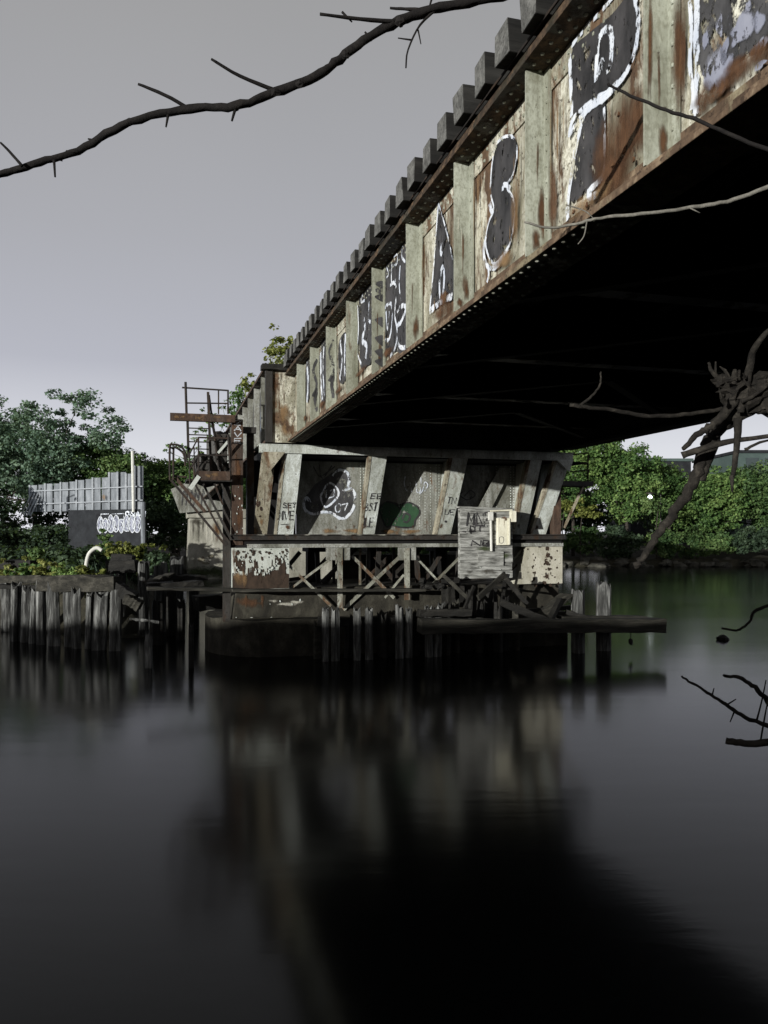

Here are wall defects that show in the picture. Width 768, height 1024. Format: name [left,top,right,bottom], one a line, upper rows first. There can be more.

rust [572,7,660,215]
rust [673,15,686,101]
rust [695,42,767,113]
rust [434,237,469,320]
peeling [232,548,301,619]